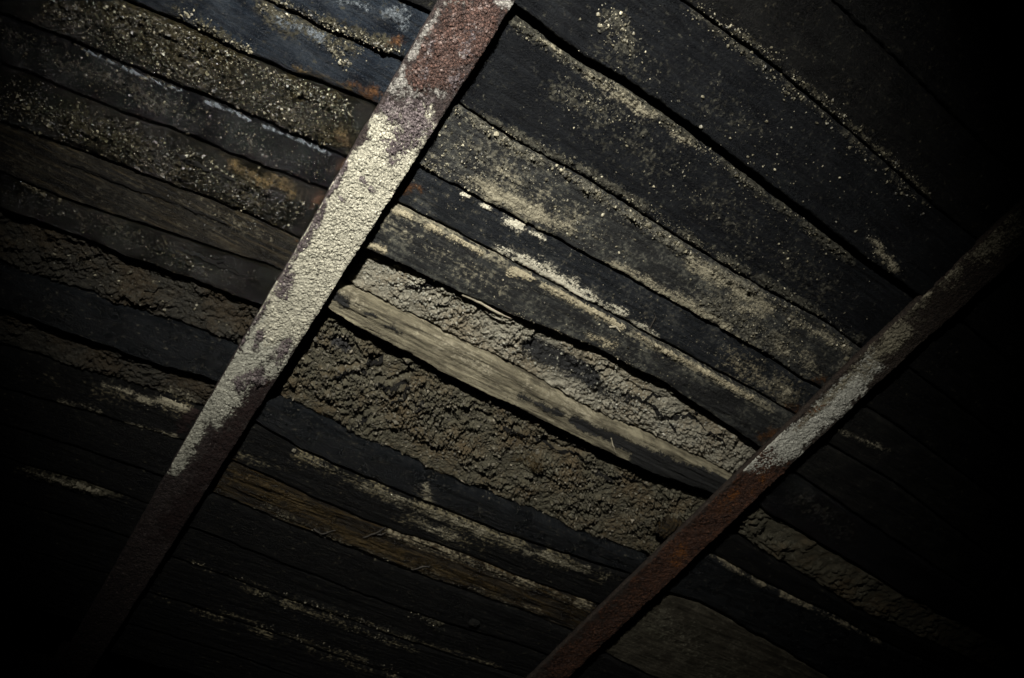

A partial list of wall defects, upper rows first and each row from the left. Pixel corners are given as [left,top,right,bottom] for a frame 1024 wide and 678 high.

damp [275,15,326,44]
damp [381,4,411,31]
damp [83,49,182,92]
rust [351,0,508,167]
damp [204,100,331,155]
damp [227,159,302,199]
damp [460,176,578,241]
damp [363,242,387,254]
damp [392,207,792,406]
damp [770,317,852,380]
rust [537,426,791,678]